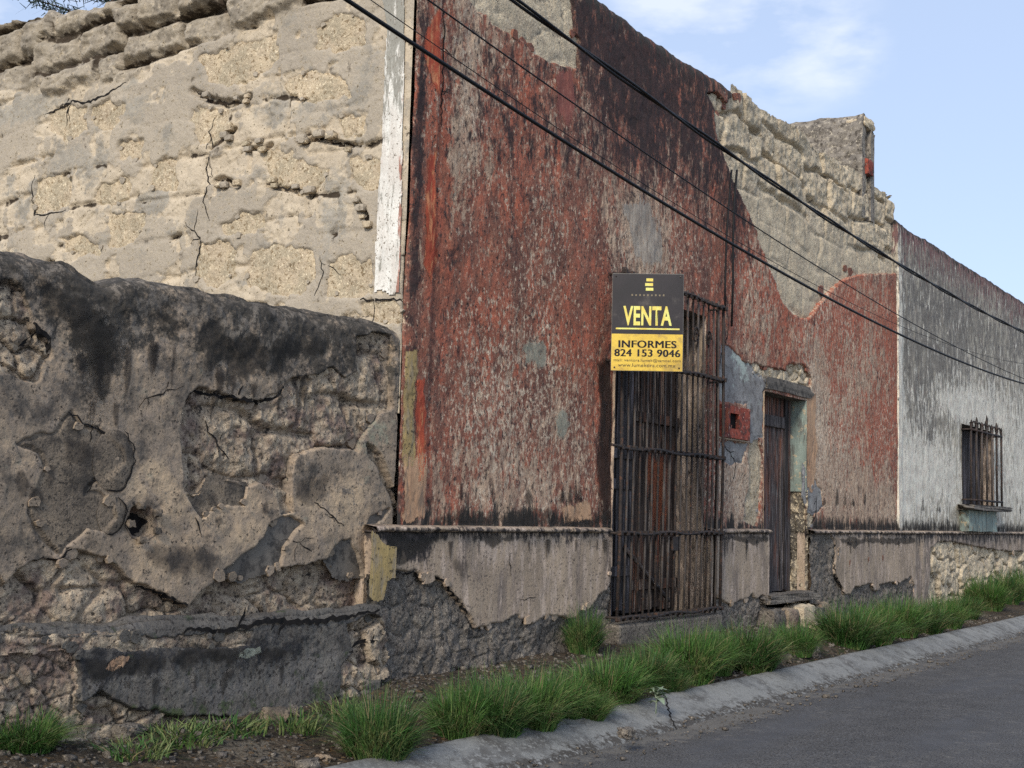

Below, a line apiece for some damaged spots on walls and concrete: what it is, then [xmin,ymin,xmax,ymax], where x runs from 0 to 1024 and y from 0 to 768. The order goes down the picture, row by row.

crack [43,82,126,126]
crack [186,118,219,276]
spalling [707,84,895,318]
leakage [40,281,118,399]
leakage [198,319,325,385]
crack [139,377,291,459]
spalling [0,253,612,742]
leakage [387,534,447,564]
leakage [441,360,612,547]
peeling [751,363,818,497]
spalling [804,513,1024,619]
leakage [87,644,244,680]